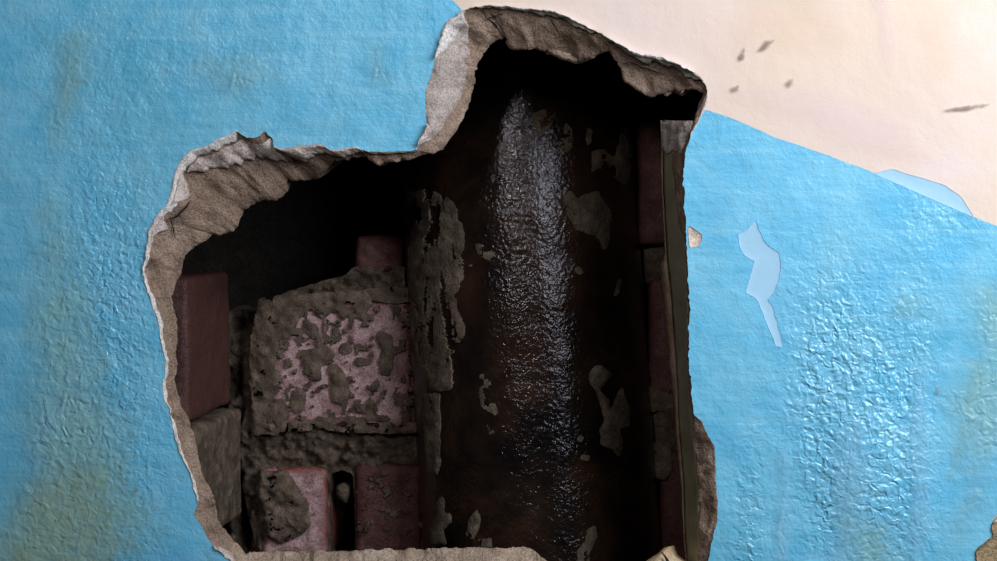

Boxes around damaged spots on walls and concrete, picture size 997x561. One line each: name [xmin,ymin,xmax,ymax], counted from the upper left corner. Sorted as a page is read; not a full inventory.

spalling [142,5,718,561]
peeling [738,221,783,347]
spalling [976,516,997,561]